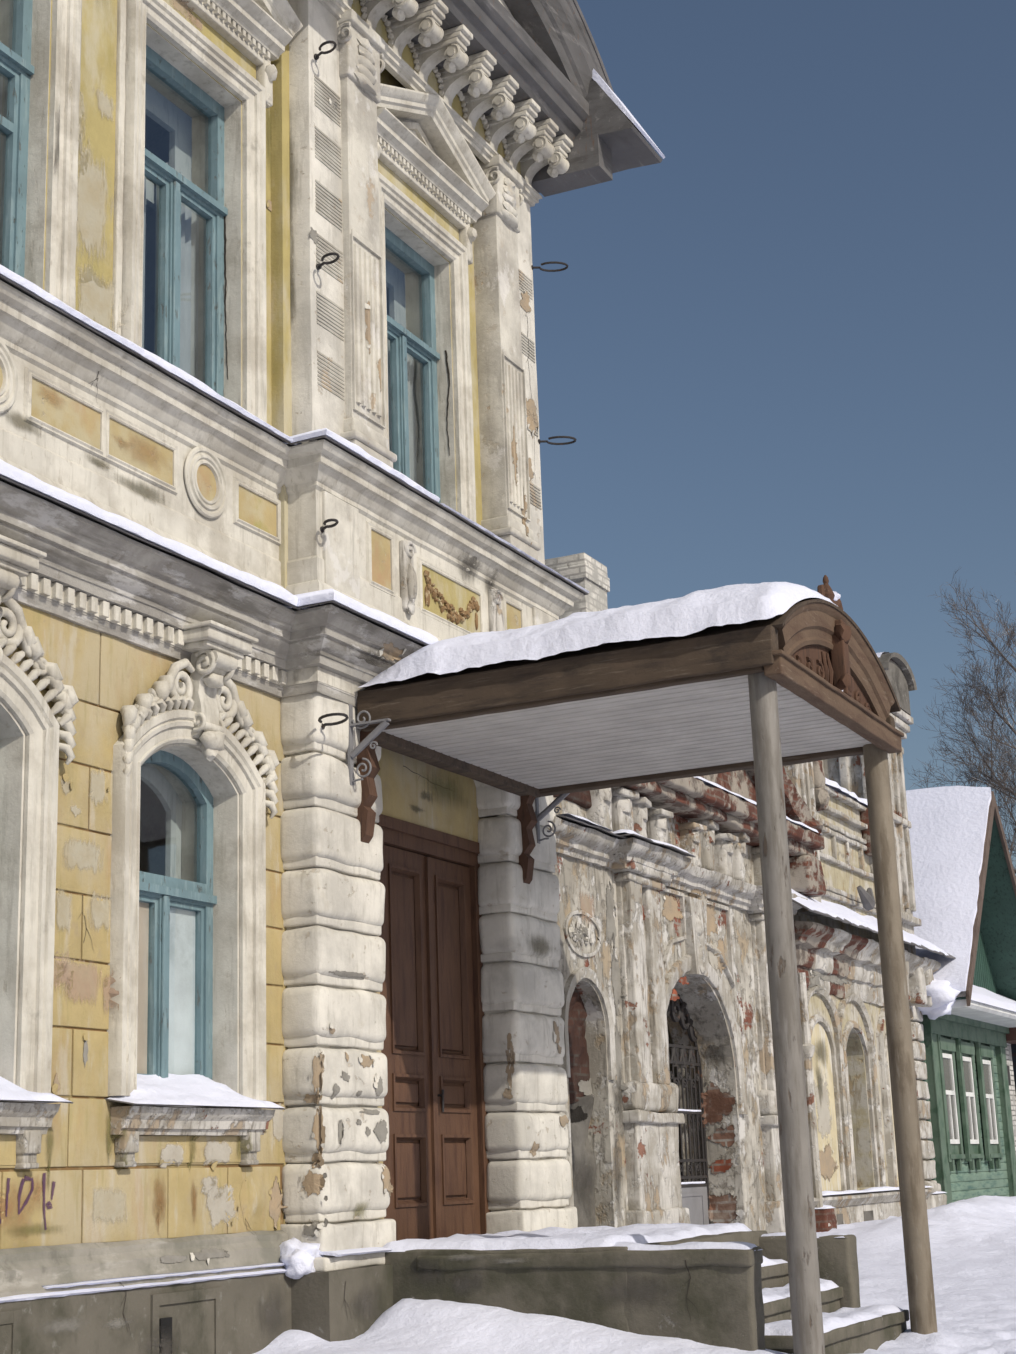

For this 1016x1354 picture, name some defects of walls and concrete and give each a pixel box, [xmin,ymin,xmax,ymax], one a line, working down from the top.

peeling [520,290,531,316]
crack [443,350,451,456]
peeling [54,953,121,1010]
peeling [568,880,629,1097]
peeling [503,1033,515,1099]
peeling [553,1021,562,1054]
peeling [301,1051,388,1201]
peeling [708,1122,735,1159]
peeling [201,1141,240,1226]
peeling [376,1162,393,1196]
spalling [303,1218,328,1237]